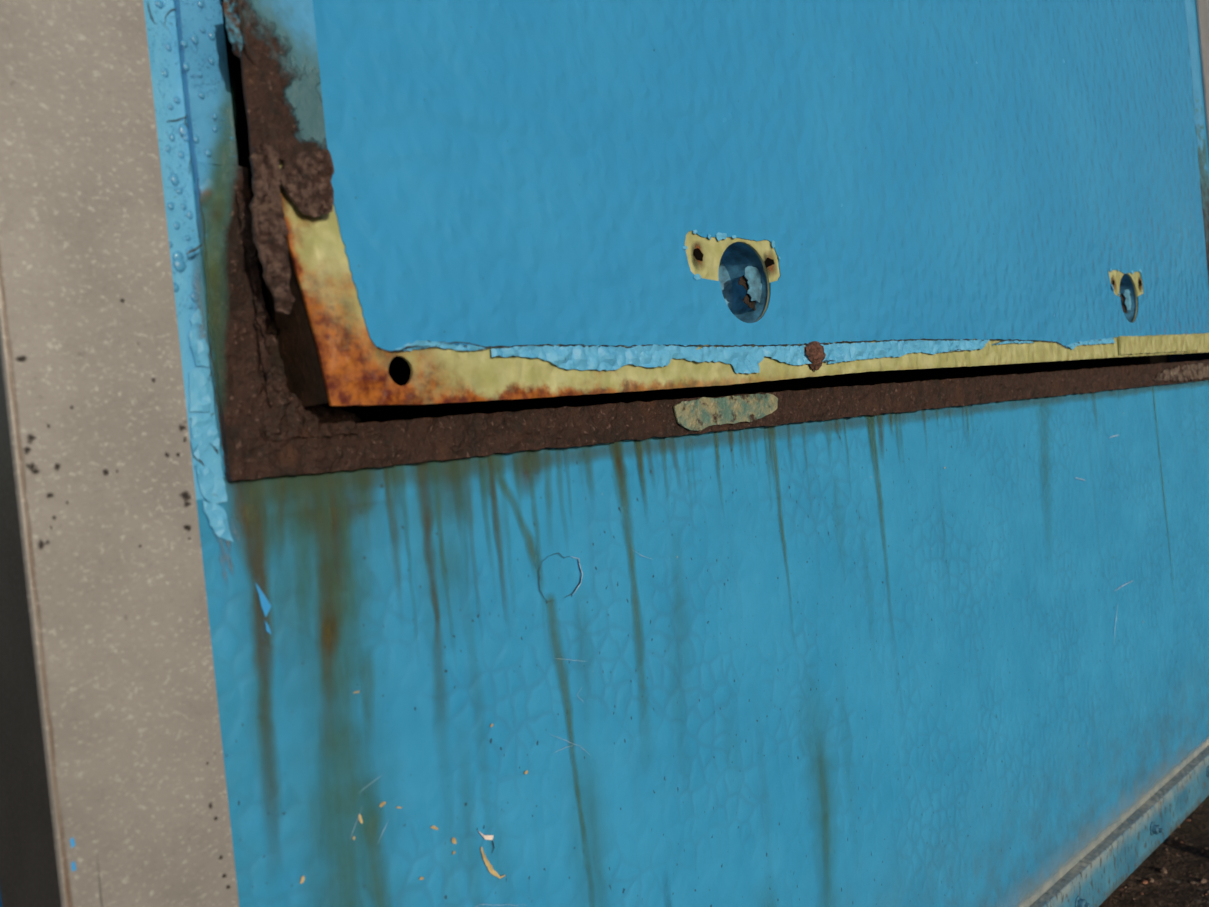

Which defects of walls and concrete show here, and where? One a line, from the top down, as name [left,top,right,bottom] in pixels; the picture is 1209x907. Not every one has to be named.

peeling [222,0,258,59]
peeling [282,188,1202,402]
peeling [188,308,234,542]
corrosion [234,475,285,735]
peeling [255,582,272,635]
corrosion [305,468,370,665]
corrosion [418,462,431,547]